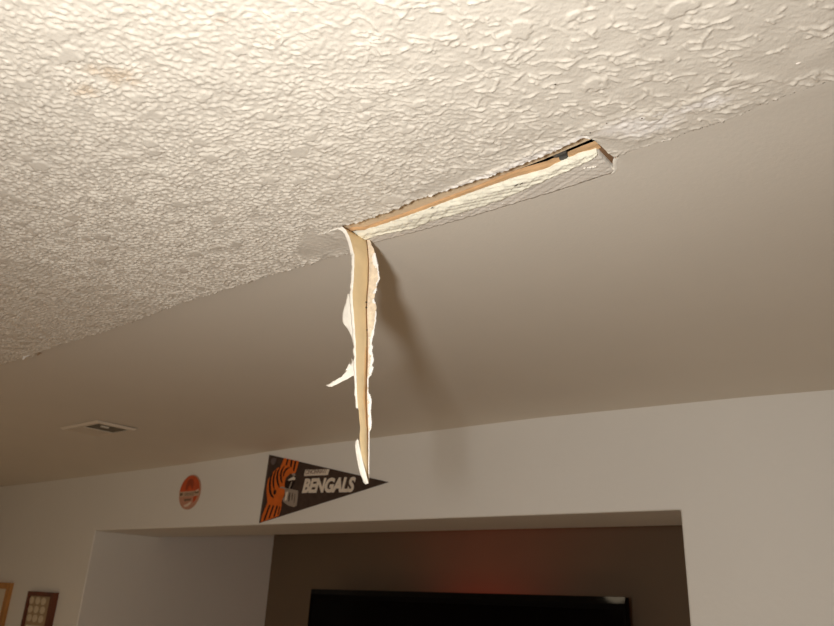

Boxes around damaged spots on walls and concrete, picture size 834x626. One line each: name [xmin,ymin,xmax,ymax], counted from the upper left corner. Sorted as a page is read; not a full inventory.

peeling [342,293,353,340]
peeling [326,358,354,387]